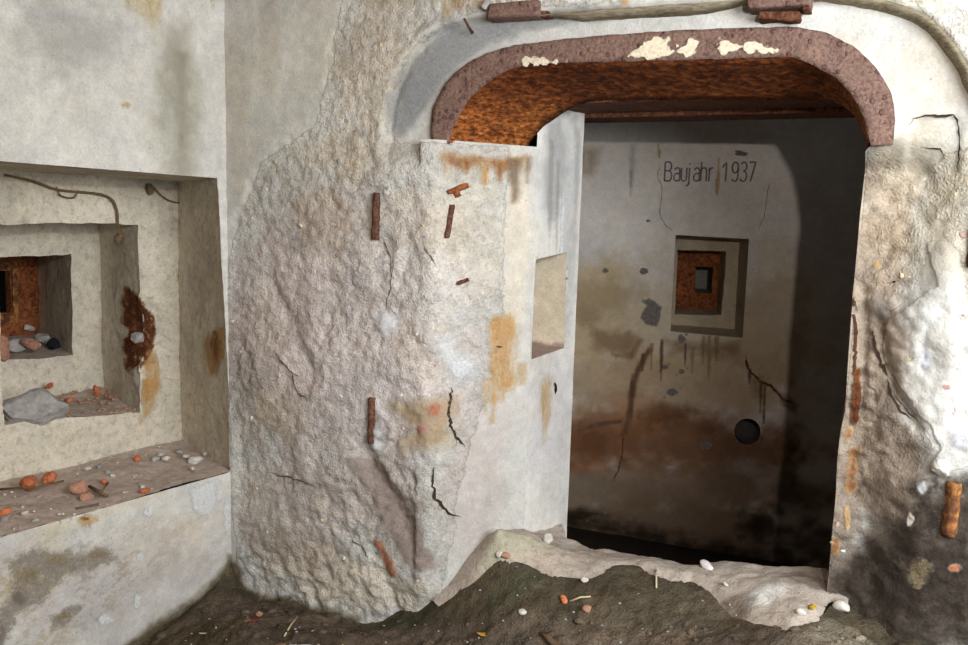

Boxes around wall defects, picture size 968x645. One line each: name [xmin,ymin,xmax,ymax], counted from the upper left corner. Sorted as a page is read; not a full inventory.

spalling [542,0,619,8]
spalling [894,0,968,63]
crack [908,114,961,169]
spalling [227,0,525,624]
crack [852,298,919,422]
crack [447,388,465,446]
crack [431,468,461,517]
leakage [567,508,800,566]
leakage [829,473,968,645]